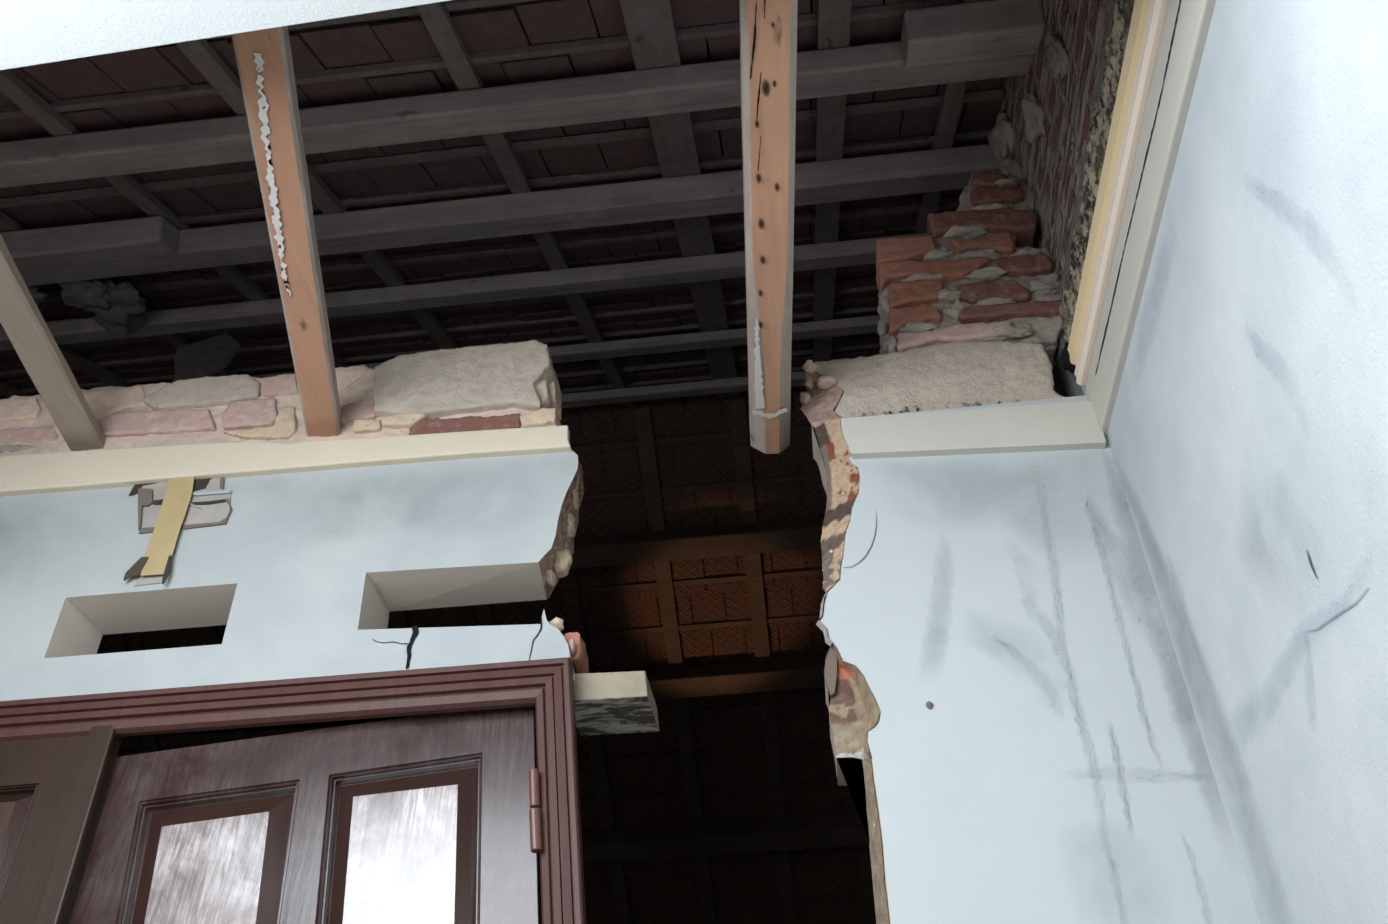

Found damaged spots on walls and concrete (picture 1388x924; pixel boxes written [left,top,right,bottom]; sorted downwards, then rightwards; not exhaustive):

spalling [123,477,232,586]
spalling [540,463,584,599]
spalling [800,360,880,760]
crack [843,517,877,568]
crack [372,625,419,669]
flaking render [549,617,576,654]